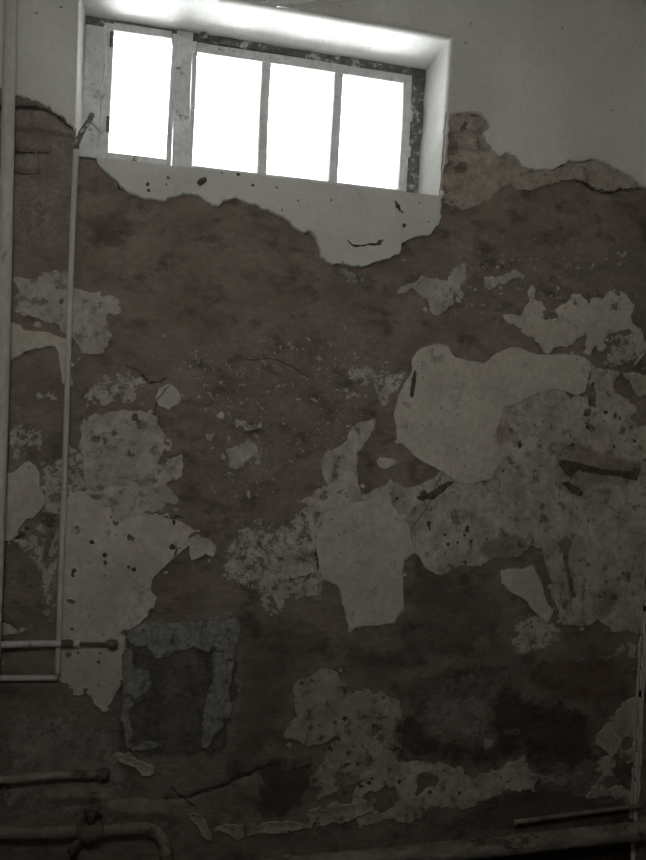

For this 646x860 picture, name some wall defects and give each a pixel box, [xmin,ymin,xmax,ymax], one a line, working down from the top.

flaking render [11,95,76,339]
spalling [558,460,641,480]
flaking render [1,346,64,641]
flaking render [0,647,55,675]
peeling [635,615,646,818]
crack [164,766,267,807]
flaking render [603,754,634,792]
flaking render [0,834,160,860]